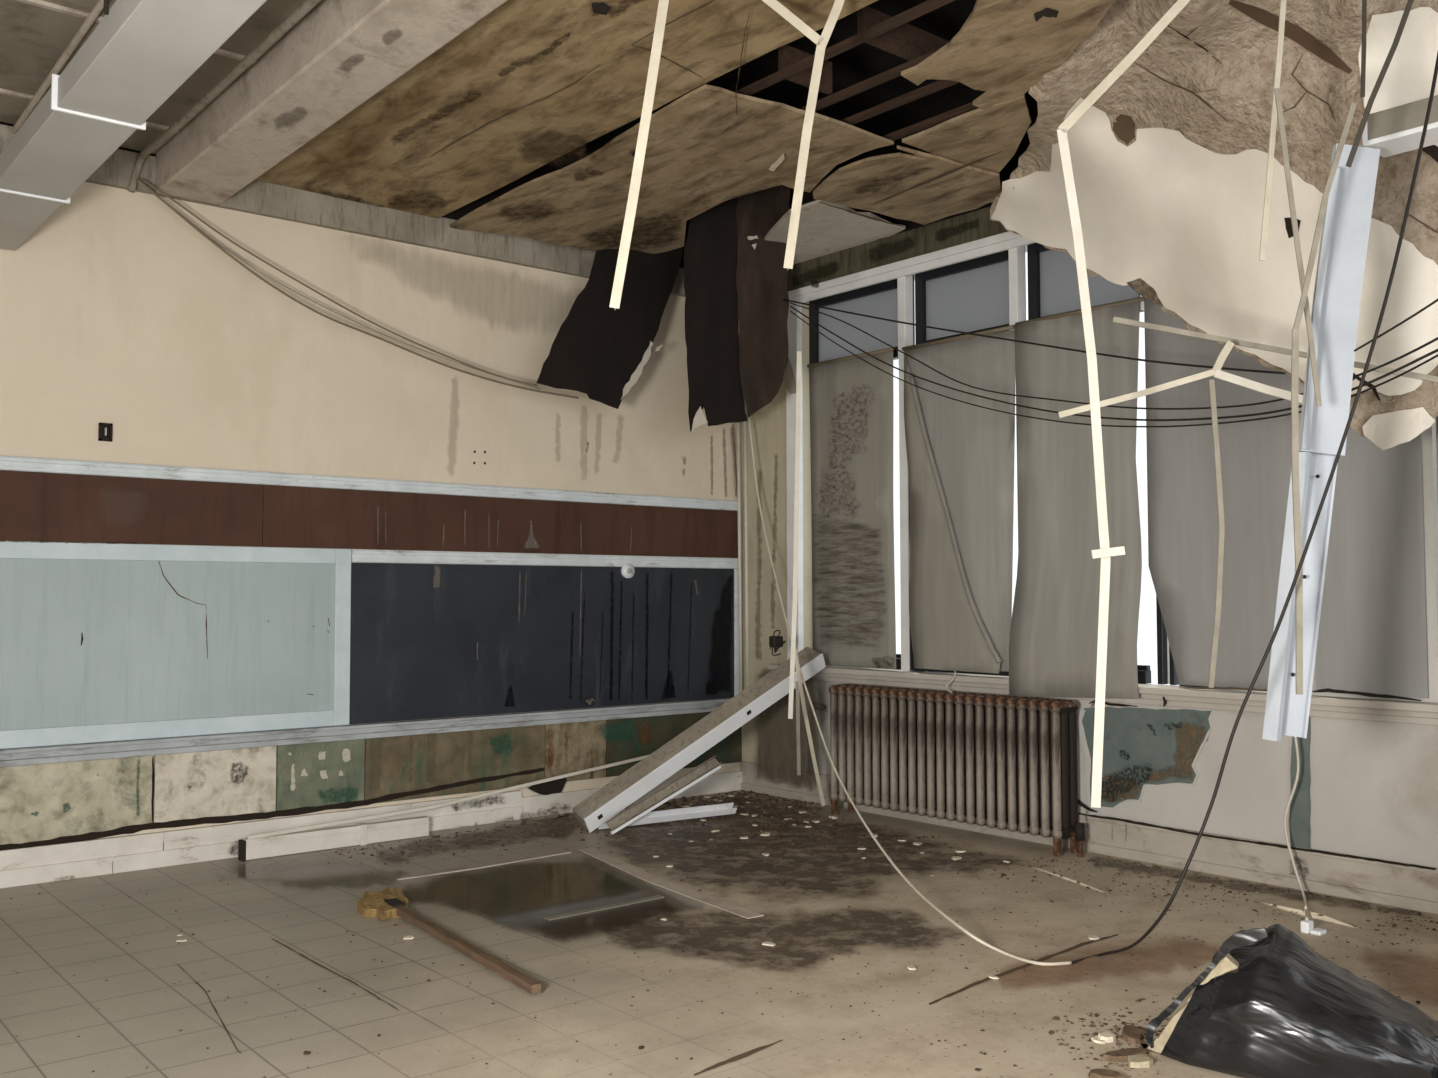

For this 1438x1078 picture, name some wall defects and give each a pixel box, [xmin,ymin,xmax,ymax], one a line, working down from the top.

water stain [499,33,570,76]
water stain [321,191,443,209]
water stain [589,214,686,251]
water stain [870,238,913,261]
water stain [937,220,978,241]
spalling [1284,217,1301,238]
spalling [1127,278,1163,306]
peeling [1349,367,1438,450]
crack [158,561,208,659]
peeling [1077,707,1212,809]
water stain [379,797,578,862]